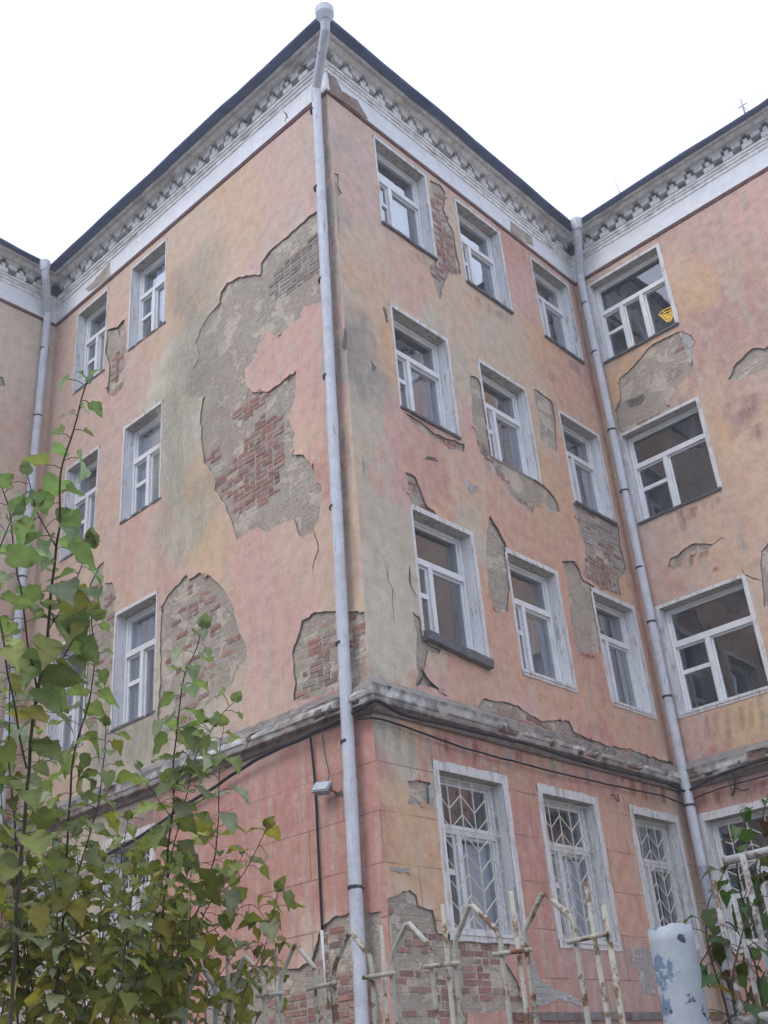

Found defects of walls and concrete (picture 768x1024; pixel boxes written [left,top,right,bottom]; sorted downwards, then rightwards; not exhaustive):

peeling [429,180,461,300]
peeling [105,320,127,397]
peeling [182,209,322,540]
peeling [728,346,768,381]
peeling [404,375,559,515]
peeling [562,503,626,654]
peeling [157,572,247,732]
peeling [292,611,366,701]
crack [416,667,447,696]
peeling [477,698,673,765]
peeling [204,913,355,1024]
peeling [364,890,524,1024]